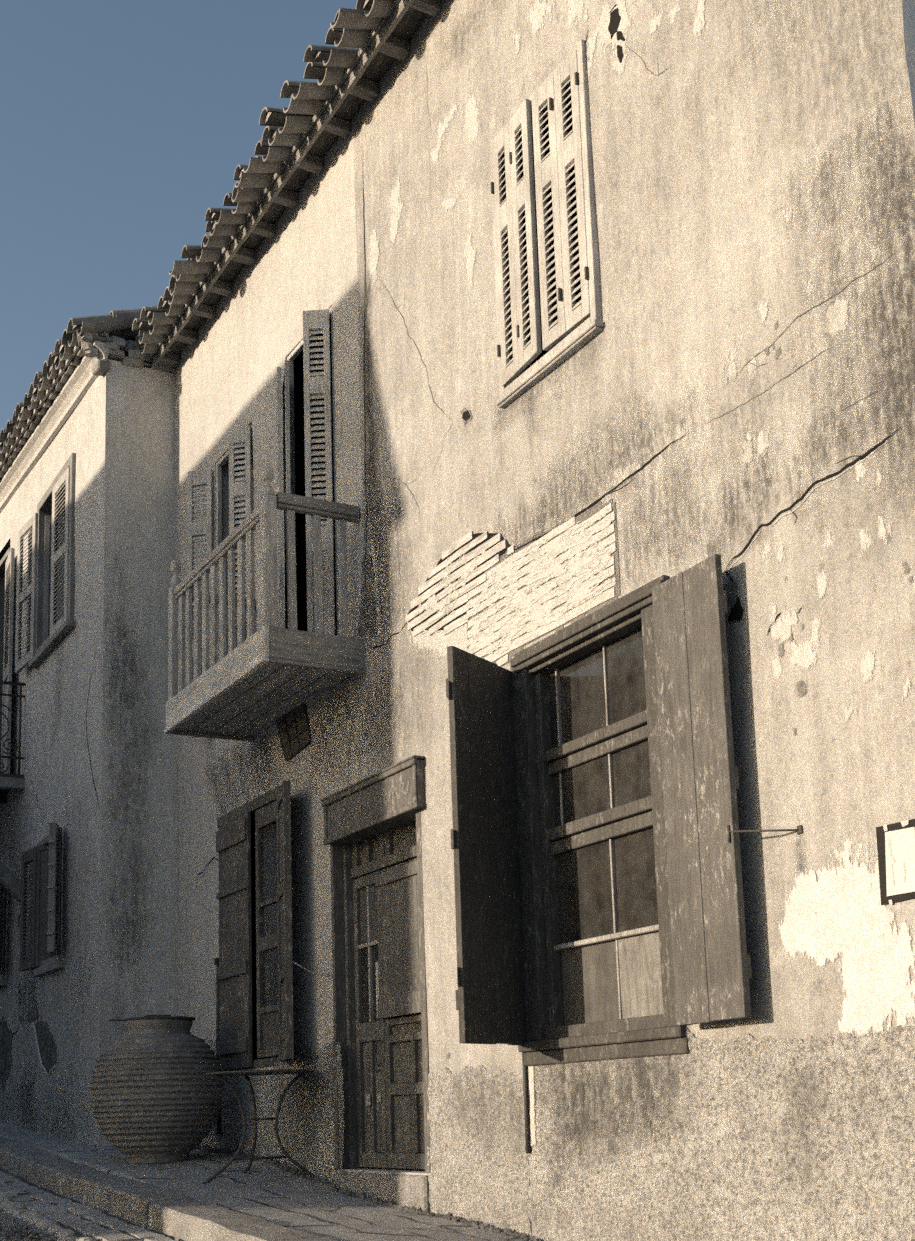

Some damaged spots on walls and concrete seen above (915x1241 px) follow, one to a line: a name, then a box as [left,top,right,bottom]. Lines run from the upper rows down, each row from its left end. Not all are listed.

peeling [513,0,631,79]
peeling [693,0,705,37]
crack [518,245,903,549]
spalling [405,460,641,667]
peeling [741,430,771,466]
crack [724,427,902,588]
peeling [818,571,828,599]
peeling [855,460,882,486]
peeling [860,516,892,552]
peeling [769,605,821,697]
peeling [778,839,915,1036]
spalling [0,1004,57,1094]